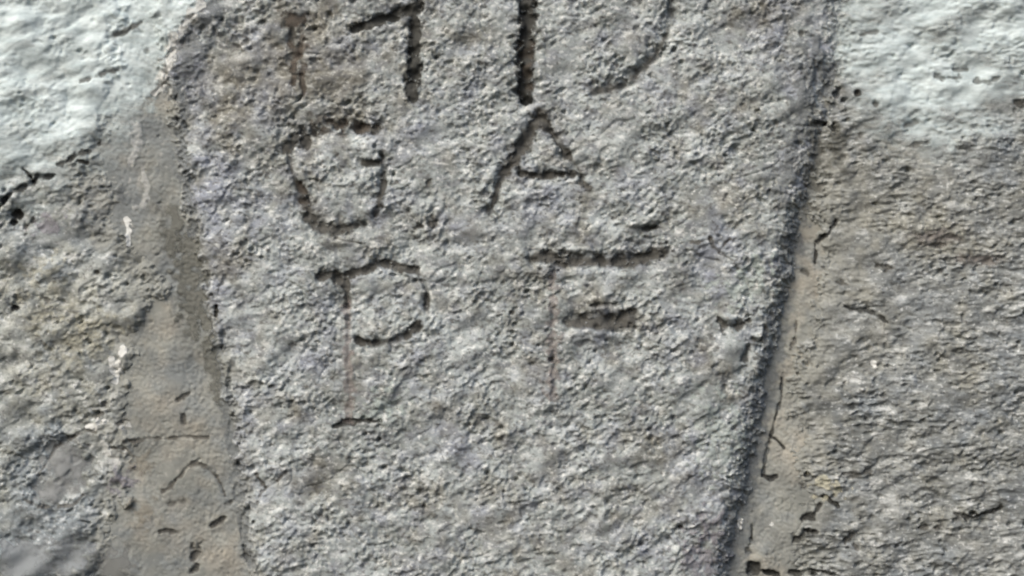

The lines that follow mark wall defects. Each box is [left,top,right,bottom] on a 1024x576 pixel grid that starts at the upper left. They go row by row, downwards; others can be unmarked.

crack [761,377,785,482]